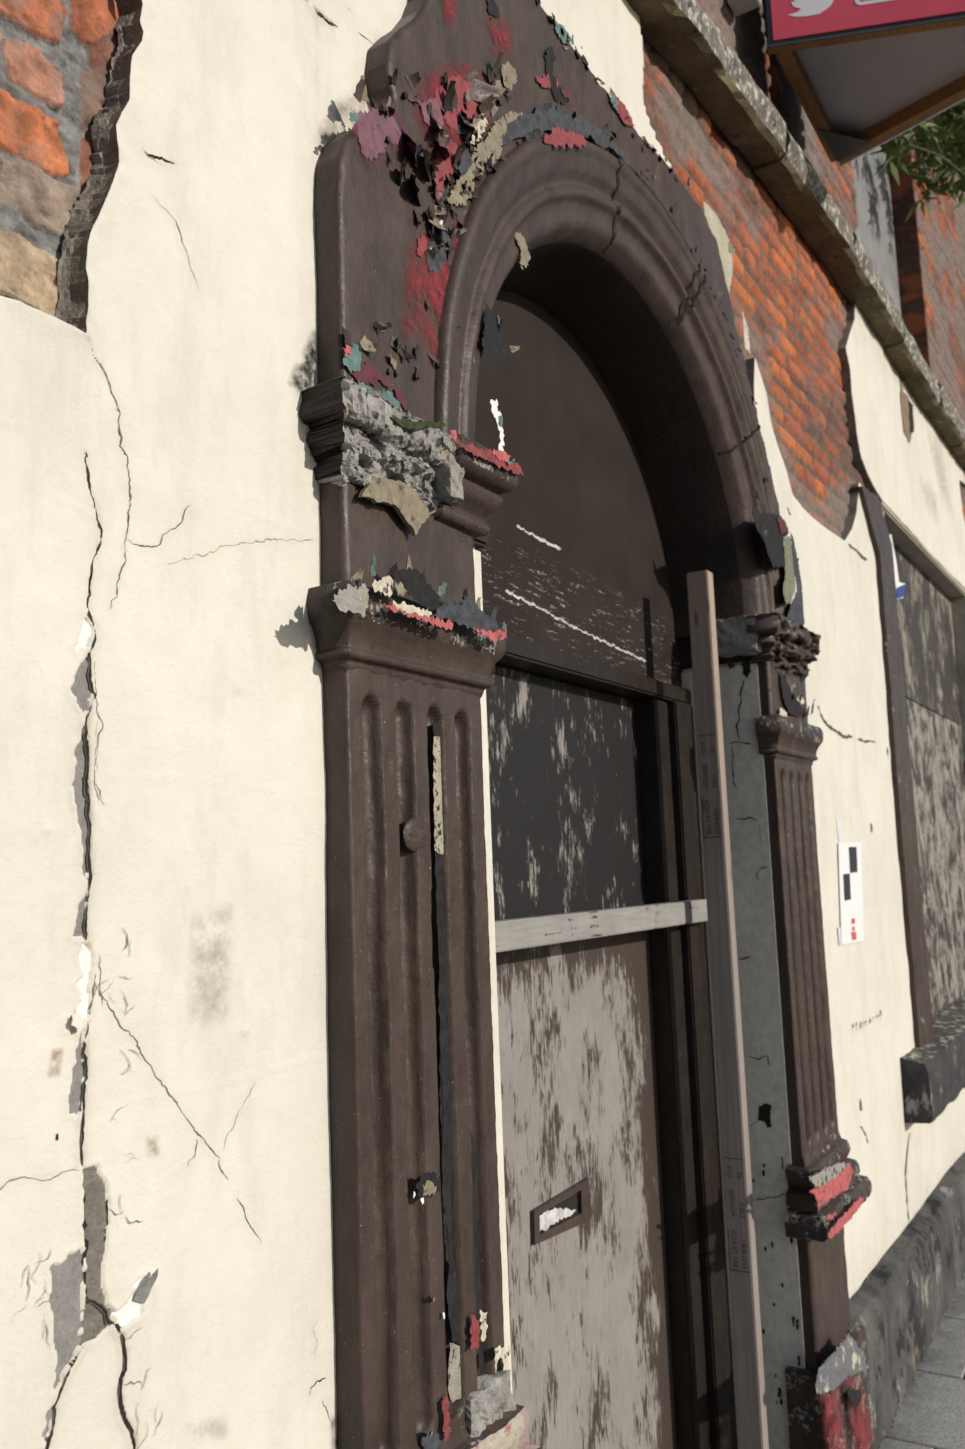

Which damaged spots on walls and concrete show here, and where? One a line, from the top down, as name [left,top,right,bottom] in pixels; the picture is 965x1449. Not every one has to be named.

crack [306,0,373,44]
spalling [0,0,140,332]
flaking render [911,133,965,424]
flaking render [299,0,867,719]
crack [0,349,313,1240]
peeling [809,1162,864,1239]
peeling [42,1406,54,1439]
crack [45,1299,136,1449]
spalling [421,1310,516,1449]
peeling [816,1333,871,1449]